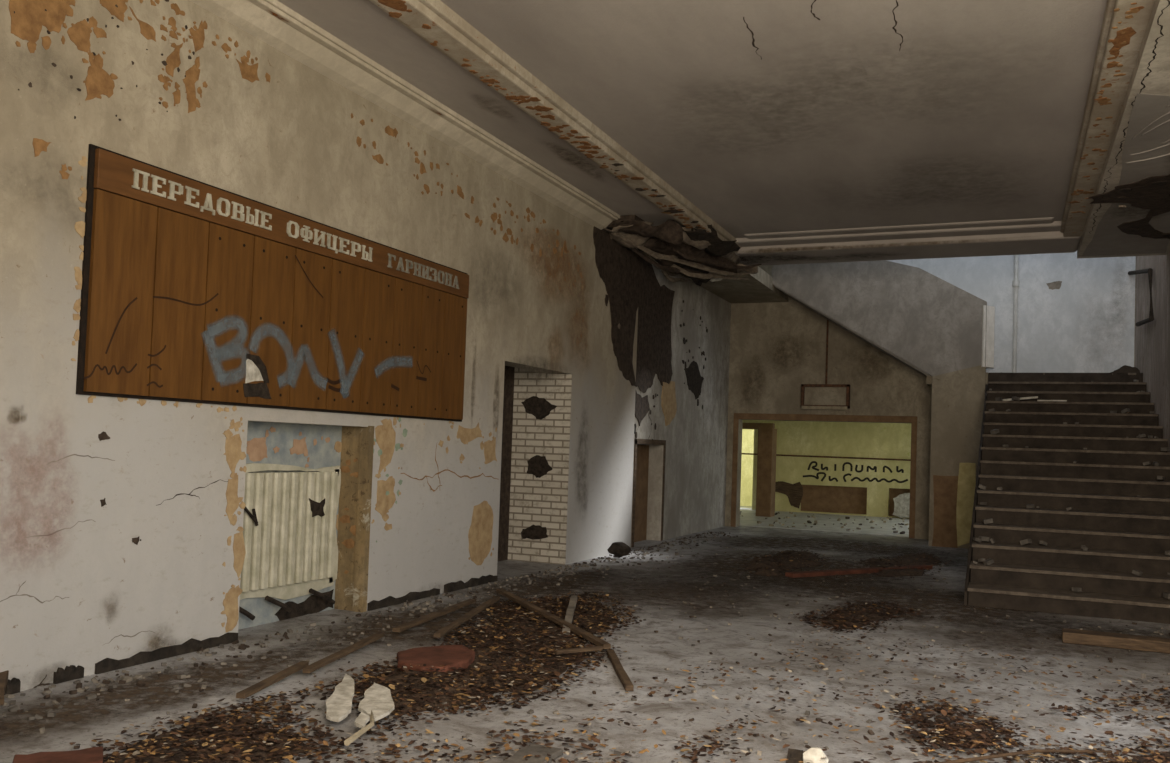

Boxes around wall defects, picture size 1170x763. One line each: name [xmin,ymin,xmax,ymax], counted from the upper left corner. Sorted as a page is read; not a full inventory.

peeling [9,0,271,113]
crack [743,17,762,60]
crack [892,0,903,51]
peeling [1082,93,1170,256]
peeling [59,156,88,361]
flaking render [593,226,706,438]
crack [48,454,115,464]
crack [156,480,228,506]
peeling [196,403,358,632]
peeling [372,417,408,542]
spalling [521,396,557,420]
crack [0,581,69,603]